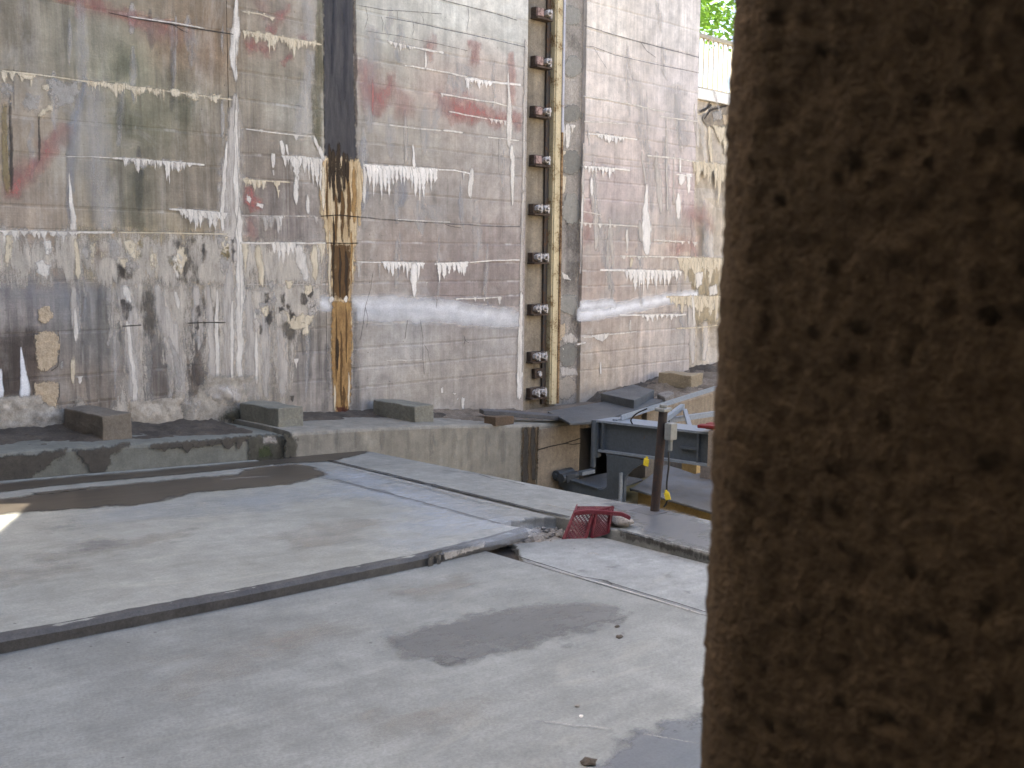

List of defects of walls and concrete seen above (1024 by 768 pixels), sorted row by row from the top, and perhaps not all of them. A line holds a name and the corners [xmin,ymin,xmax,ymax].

peeling [34,306,63,408]
damp [0,433,366,515]
damp [0,0,474,420]
peeling [253,281,317,335]
rust [319,143,367,412]
damp [354,40,527,400]
damp [563,96,727,364]
damp [389,603,626,665]